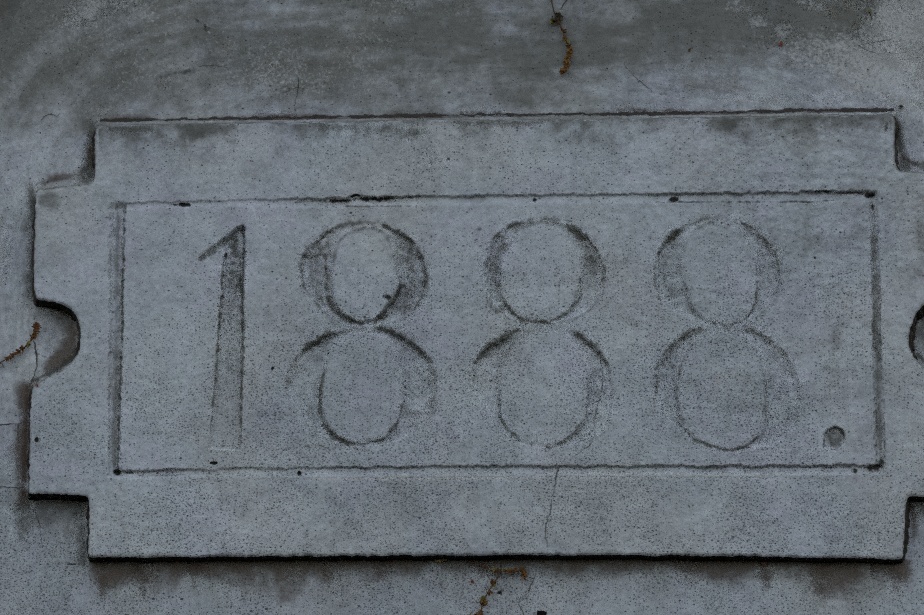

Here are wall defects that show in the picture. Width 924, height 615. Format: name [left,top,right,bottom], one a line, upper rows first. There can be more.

crack [518,362,603,615]